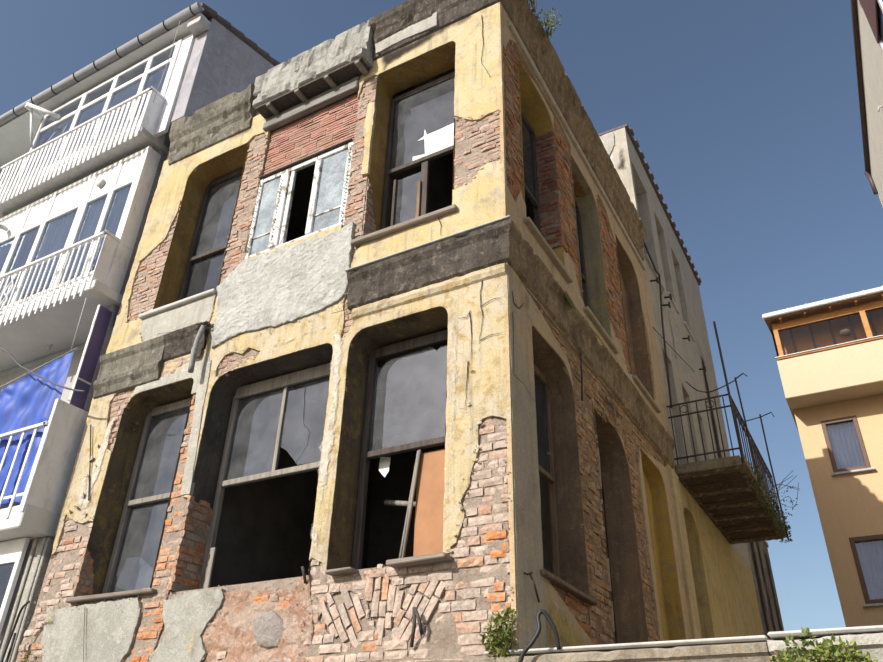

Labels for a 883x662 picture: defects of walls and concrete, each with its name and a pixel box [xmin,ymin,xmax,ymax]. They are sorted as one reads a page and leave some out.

spalling [15,387,139,662]
spalling [128,205,181,323]
spalling [123,394,212,662]
spalling [218,349,260,376]
peeling [319,295,354,502]
spalling [202,417,512,662]
spalling [340,76,378,261]
crack [460,280,524,409]
spalling [454,41,542,200]
spalling [535,109,581,295]
spalling [533,300,665,645]